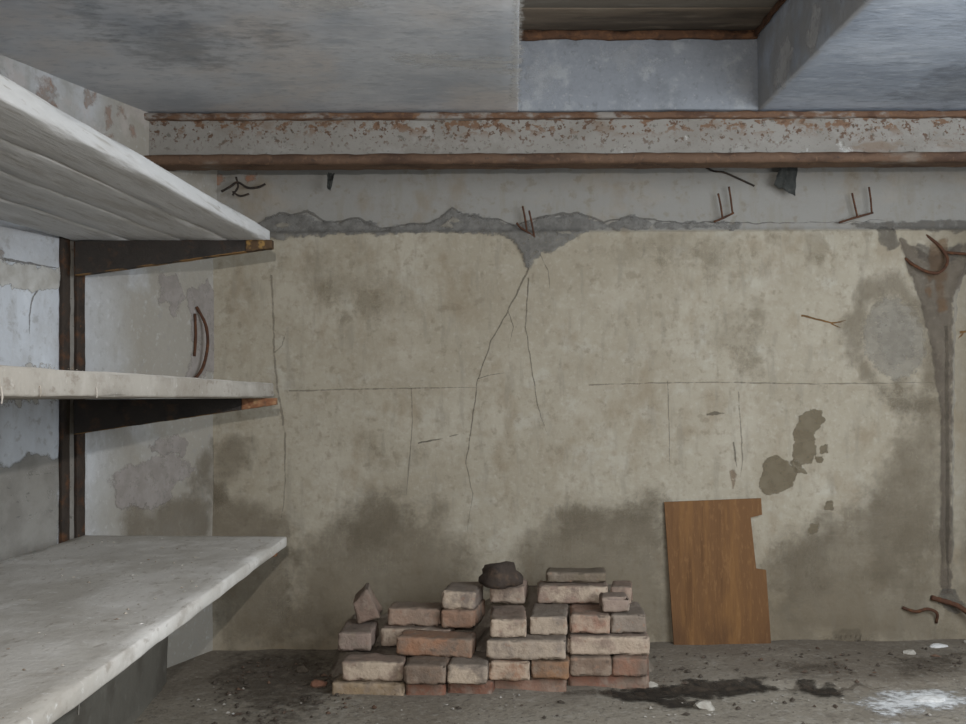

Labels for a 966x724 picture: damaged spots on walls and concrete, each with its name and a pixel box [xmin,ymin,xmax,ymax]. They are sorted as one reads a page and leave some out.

spalling [259,186,741,268]
spalling [899,234,966,623]
peeling [0,452,59,561]